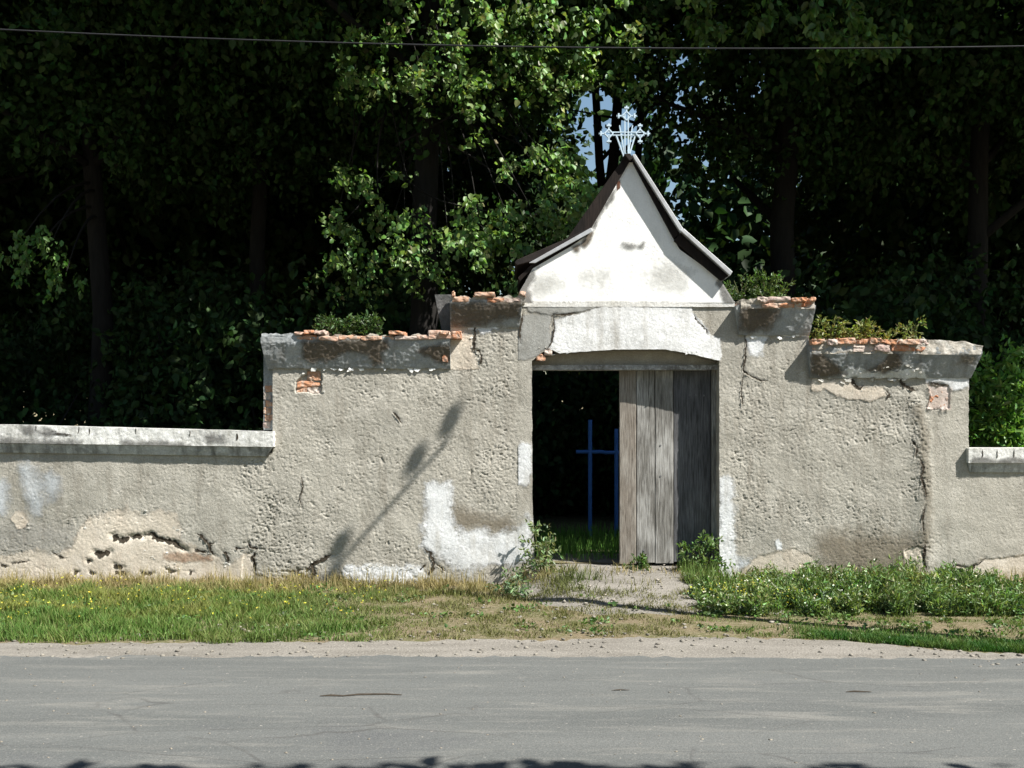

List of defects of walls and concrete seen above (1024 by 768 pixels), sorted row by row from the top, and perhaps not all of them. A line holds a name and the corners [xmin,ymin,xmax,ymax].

crack [470,328,483,365]
flaking render [297,367,364,394]
crack [741,339,767,406]
flaking render [811,365,969,410]
flaking render [0,506,256,582]